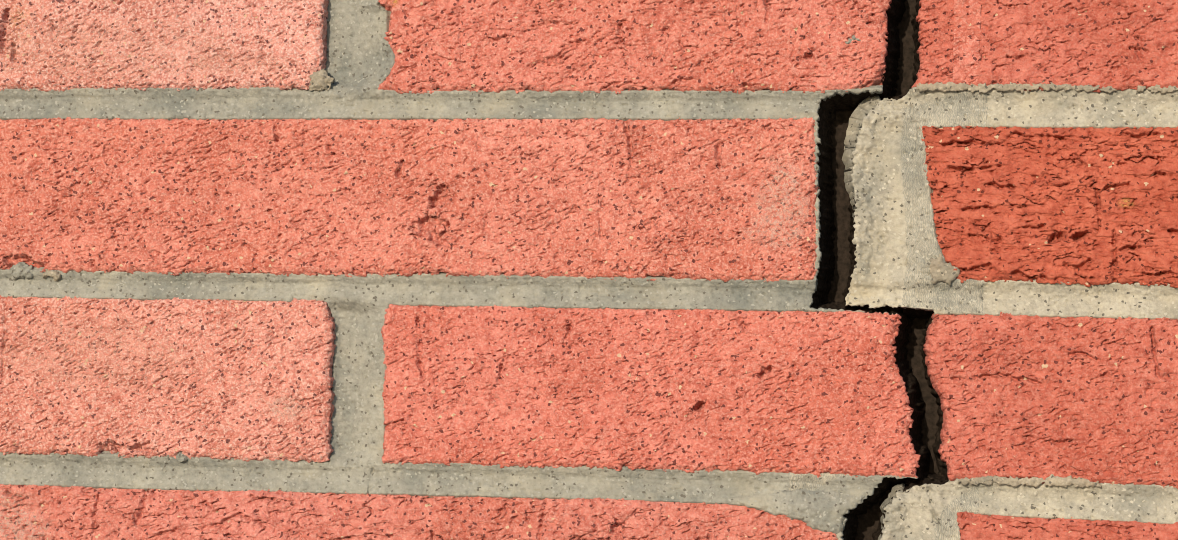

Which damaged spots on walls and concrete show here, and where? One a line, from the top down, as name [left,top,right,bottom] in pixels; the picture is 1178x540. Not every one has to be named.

crack [810,0,949,540]